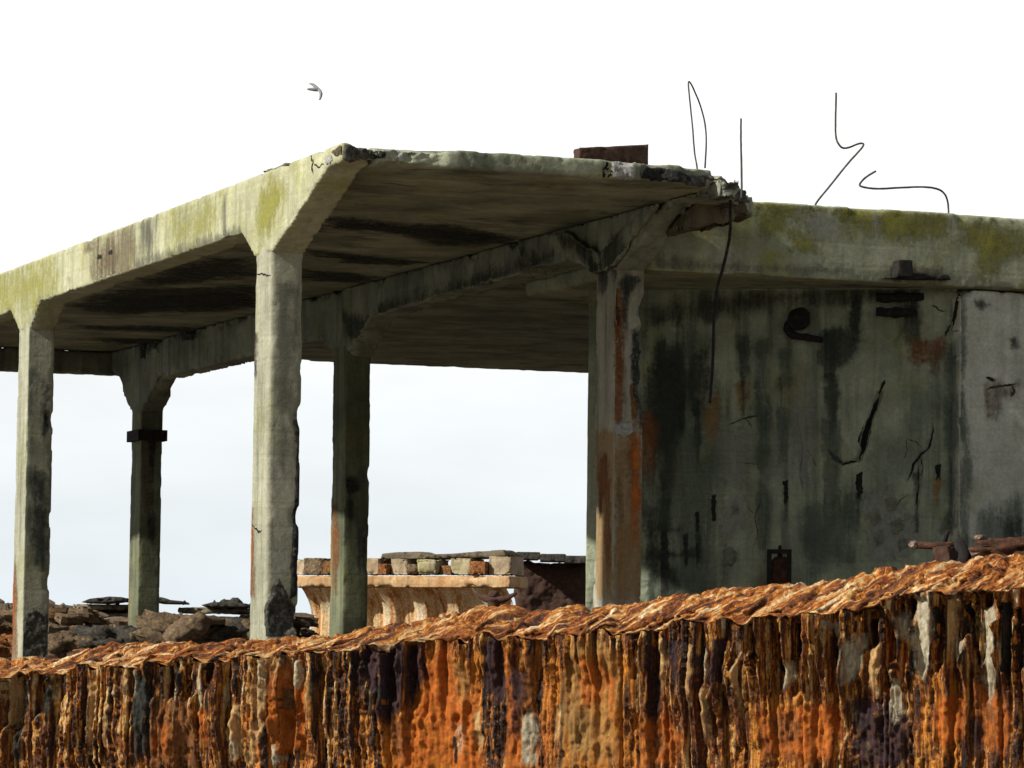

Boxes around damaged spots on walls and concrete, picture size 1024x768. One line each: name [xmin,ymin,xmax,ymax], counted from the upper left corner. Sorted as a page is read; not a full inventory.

spalling [611,81,750,237]
damp [136,219,181,267]
crack [933,291,962,336]
damp [641,338,719,595]
damp [652,289,921,566]
crack [779,377,885,487]
crack [866,423,934,560]
corrosion [132,668,209,768]
corrosion [348,645,478,768]
corrosion [479,640,539,768]
corrosion [642,638,728,767]
corrosion [757,695,914,768]